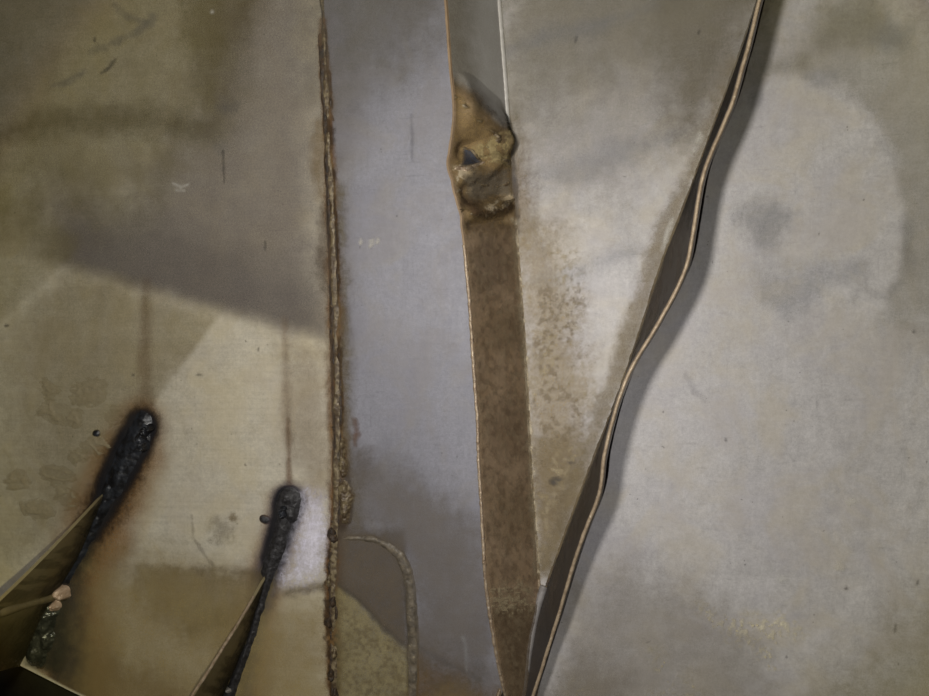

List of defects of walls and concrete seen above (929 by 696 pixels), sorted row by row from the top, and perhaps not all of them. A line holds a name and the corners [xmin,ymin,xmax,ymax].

corrosion [316,18,359,696]